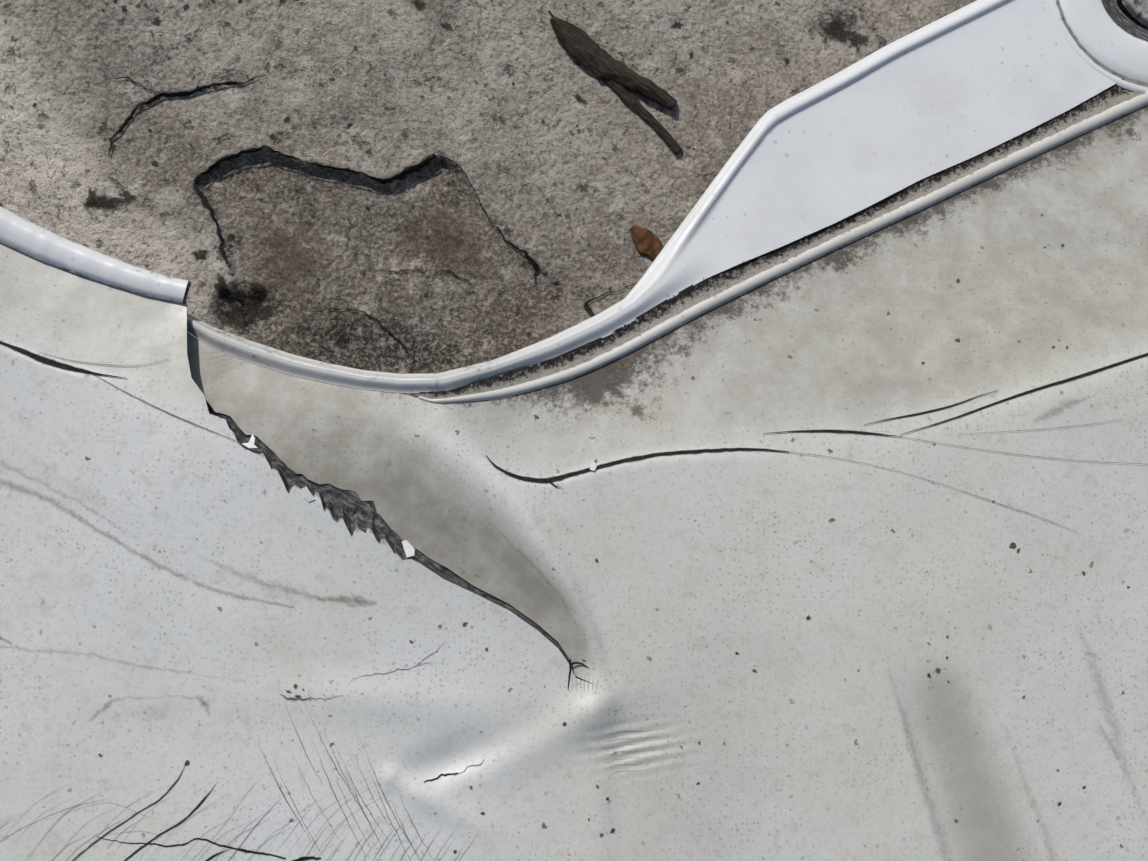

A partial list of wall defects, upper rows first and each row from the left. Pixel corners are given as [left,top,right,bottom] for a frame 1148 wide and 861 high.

crack [104,75,265,157]
crack [193,145,539,284]
crack [0,341,236,441]
crack [486,353,1148,531]